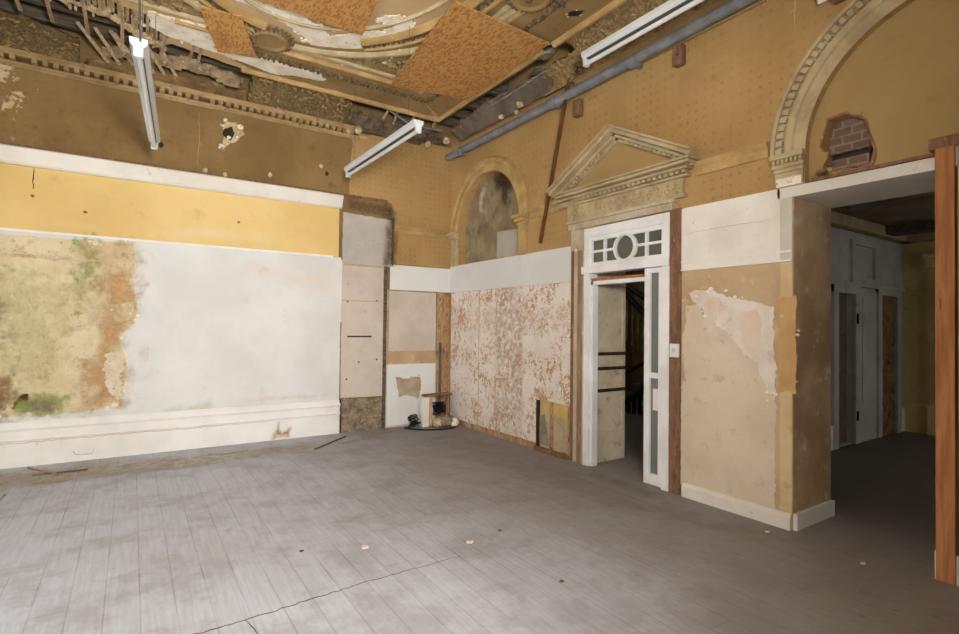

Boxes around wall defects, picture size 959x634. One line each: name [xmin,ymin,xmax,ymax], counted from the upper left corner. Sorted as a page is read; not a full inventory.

spalling [44,0,326,88]
spalling [218,118,245,151]
leakage [0,212,201,422]
flaking render [681,262,780,510]